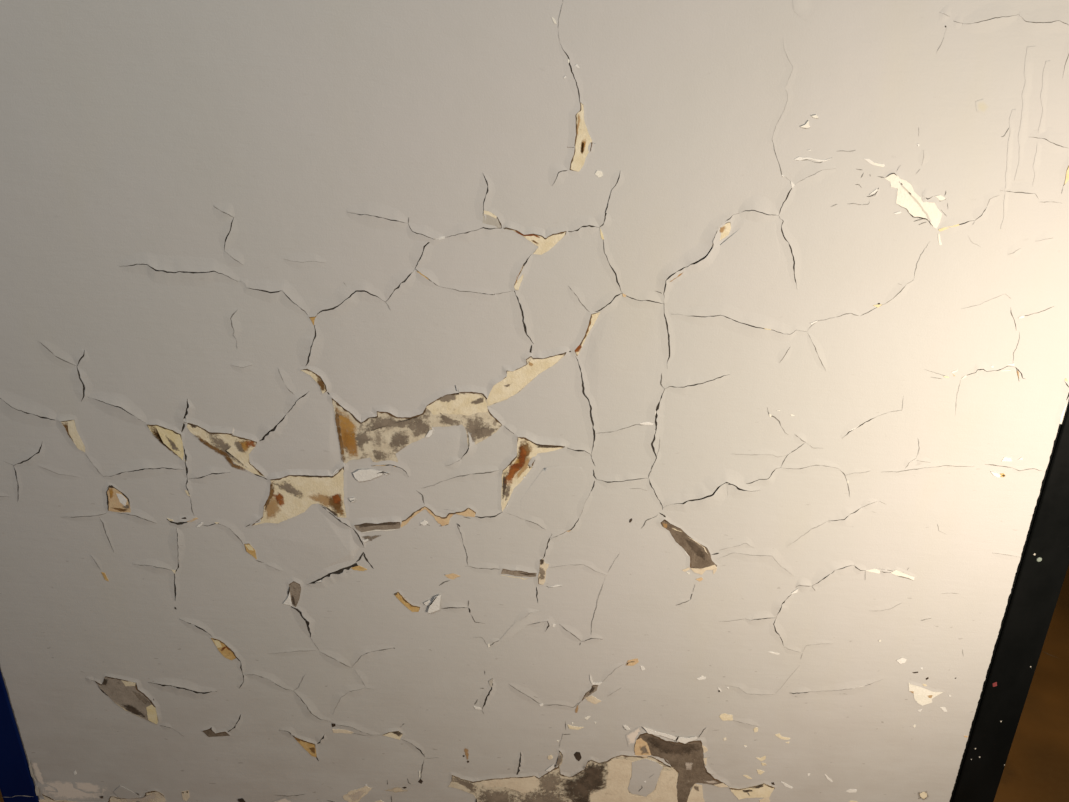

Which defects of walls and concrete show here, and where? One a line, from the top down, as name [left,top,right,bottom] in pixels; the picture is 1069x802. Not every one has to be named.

crack [937,2,1069,78]
peeling [548,99,603,187]
peeling [846,150,959,245]
crack [118,172,535,444]
crack [441,38,1058,714]
crack [0,339,267,637]
crack [148,504,395,723]
peeling [144,310,601,613]
peeling [655,513,720,581]
peeling [85,673,183,736]
water stain [573,765,605,802]
flaking render [446,658,793,802]